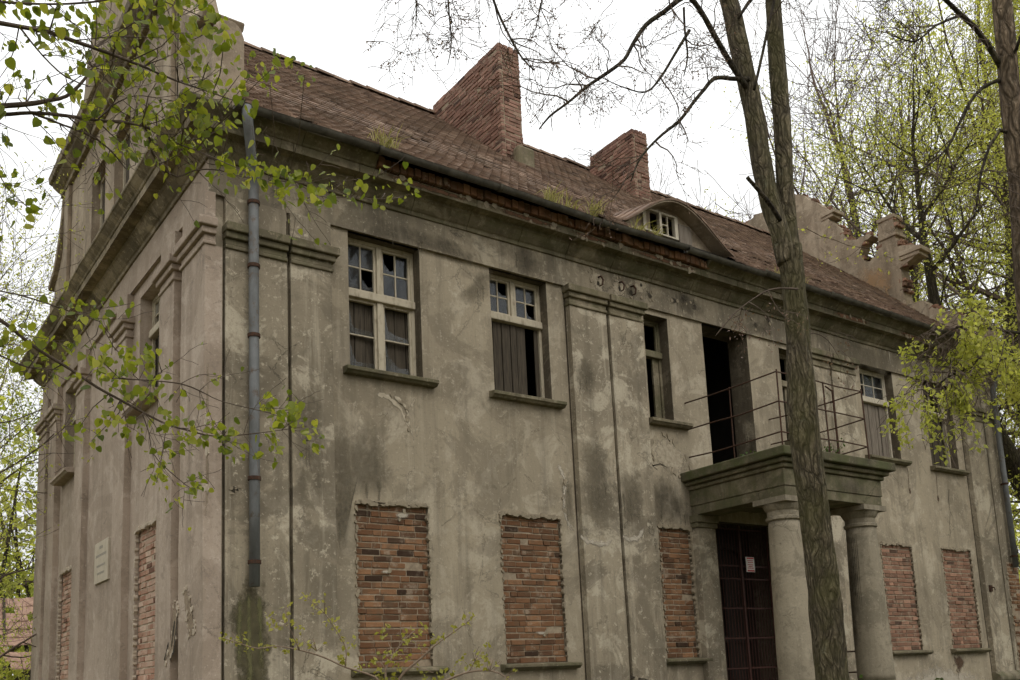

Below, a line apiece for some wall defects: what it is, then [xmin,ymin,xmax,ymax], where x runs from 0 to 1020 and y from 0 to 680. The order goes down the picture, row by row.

water stain [231,585,270,680]